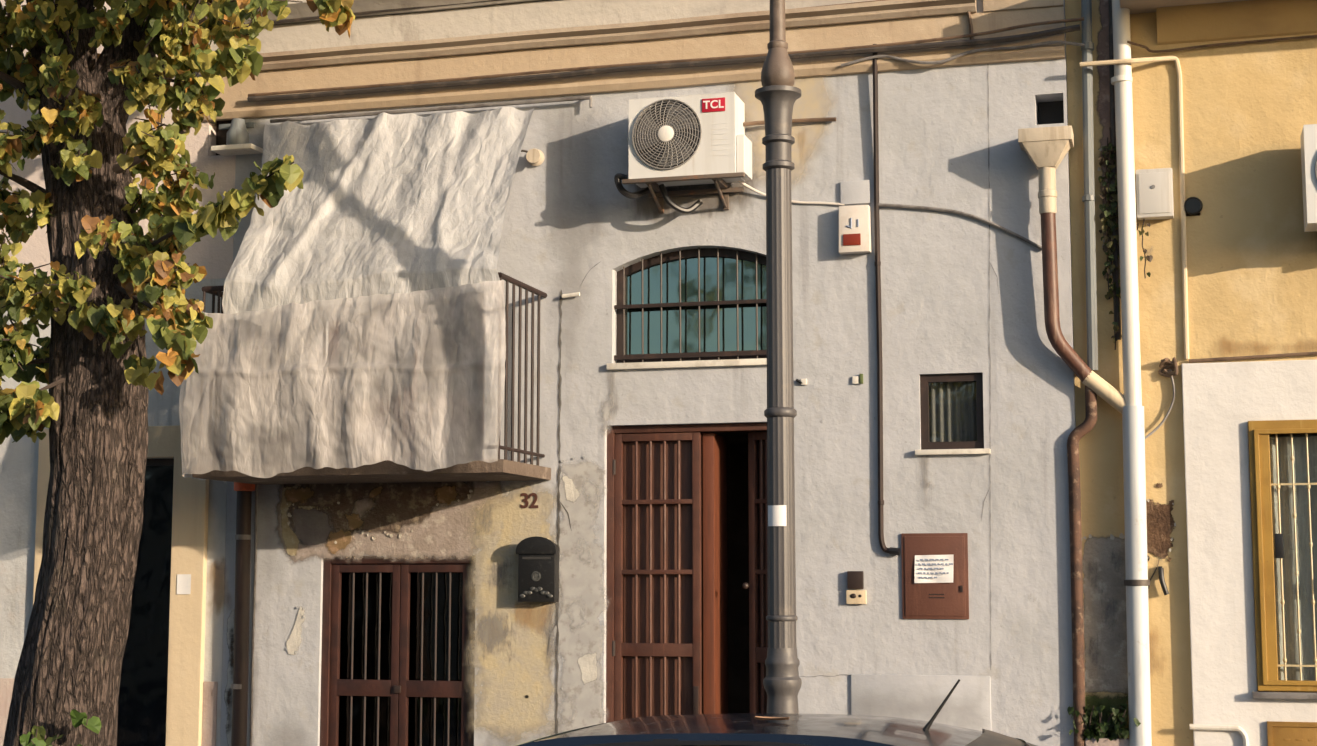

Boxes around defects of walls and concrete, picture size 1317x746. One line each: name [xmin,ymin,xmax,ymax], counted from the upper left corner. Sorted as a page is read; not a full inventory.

damp [735,81,766,177]
damp [791,77,830,182]
spalling [276,481,504,563]
spalling [1146,499,1176,562]
peeling [552,456,607,733]